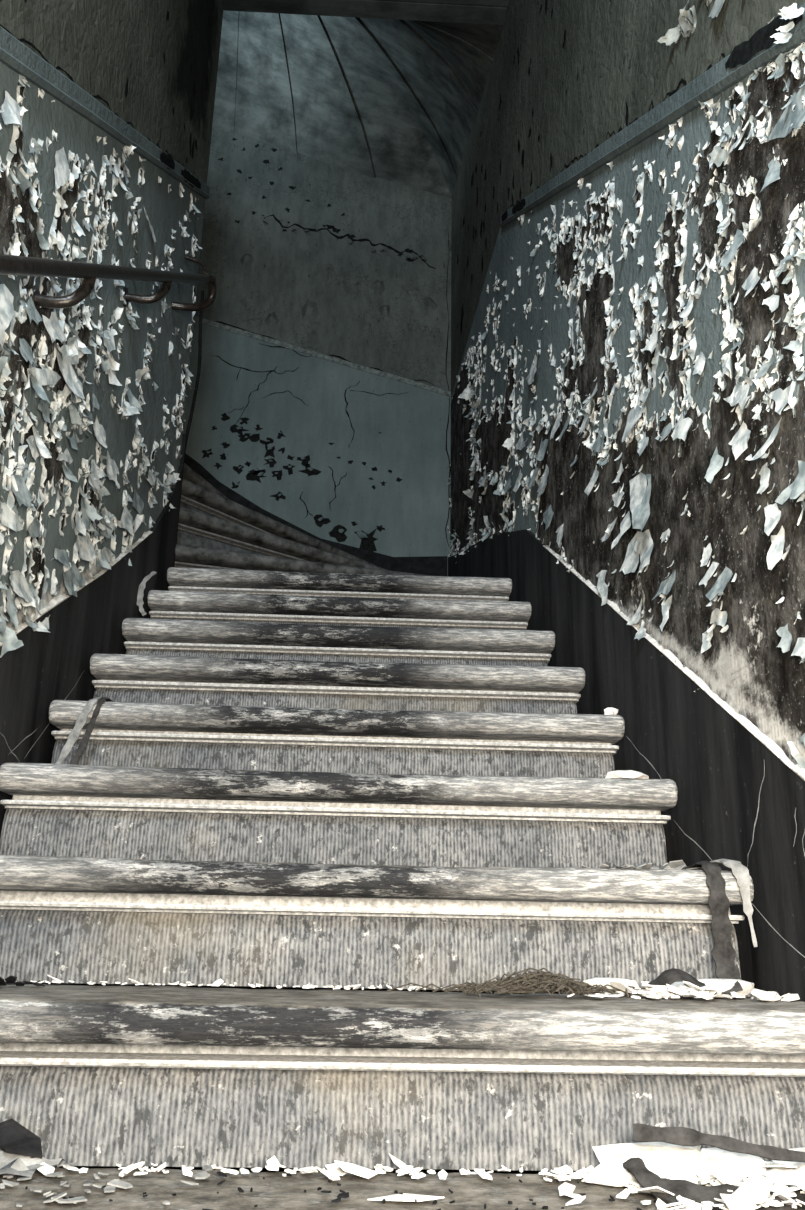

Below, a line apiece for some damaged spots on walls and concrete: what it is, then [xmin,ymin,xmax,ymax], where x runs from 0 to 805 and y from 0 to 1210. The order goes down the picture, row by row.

peeling [0,53,208,658]
peeling [201,413,321,501]
crack [214,214,451,546]
peeling [447,0,805,769]
water stain [615,576,805,764]